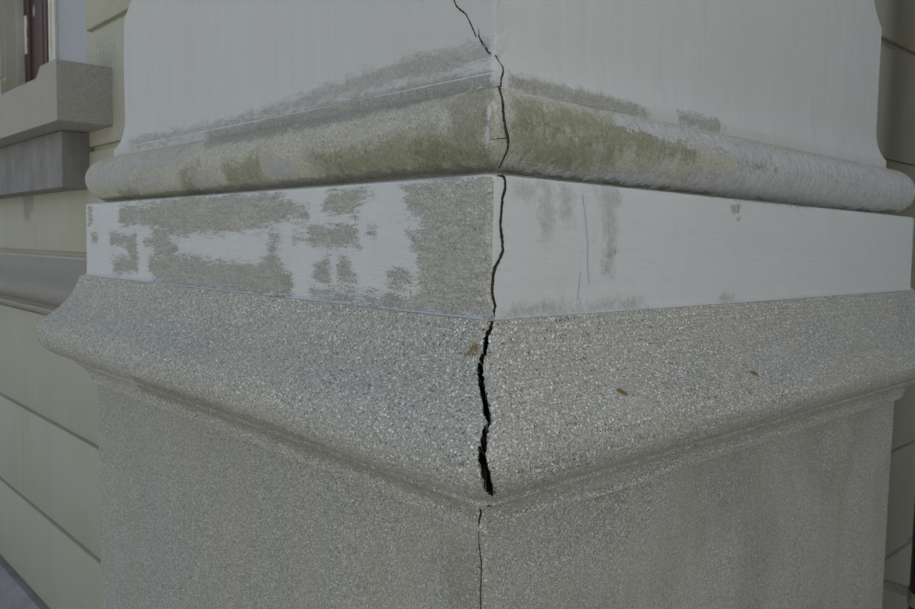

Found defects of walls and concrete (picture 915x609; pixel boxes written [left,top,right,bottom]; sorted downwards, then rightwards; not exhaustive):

water stain [207,71,494,146]
water stain [513,78,695,156]
peeling [109,174,495,321]
crack [454,0,510,609]